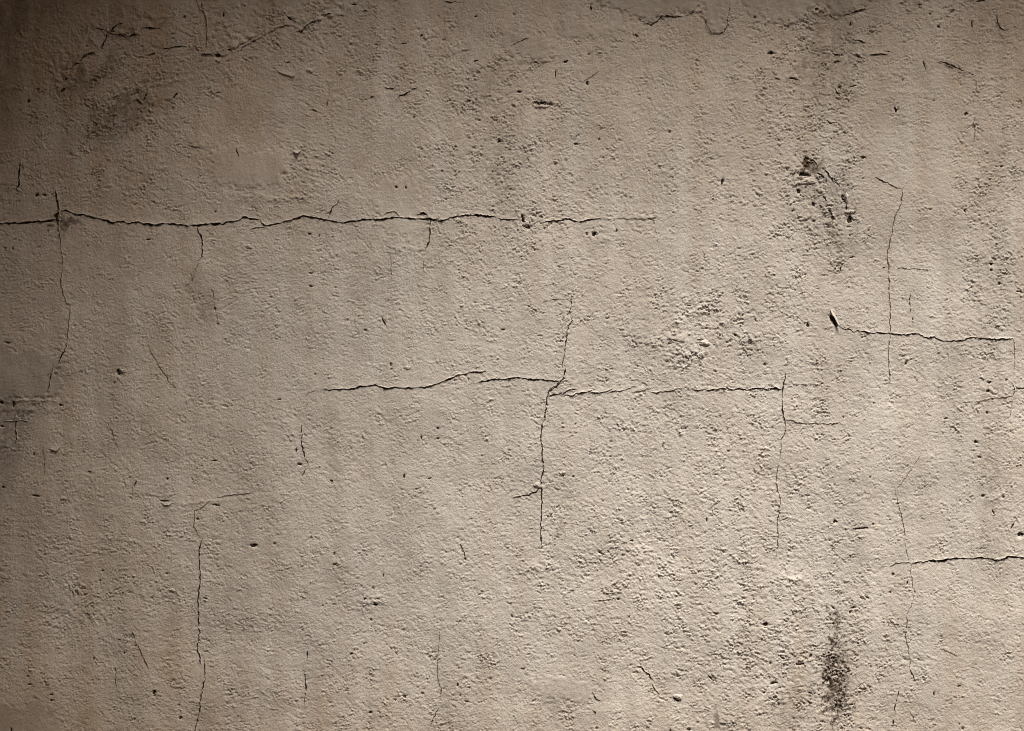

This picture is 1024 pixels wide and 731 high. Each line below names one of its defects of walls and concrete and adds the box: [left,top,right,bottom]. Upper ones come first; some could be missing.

crack [0,189,658,391]
crack [301,294,842,558]
crack [840,176,1024,415]
crack [889,456,1024,724]